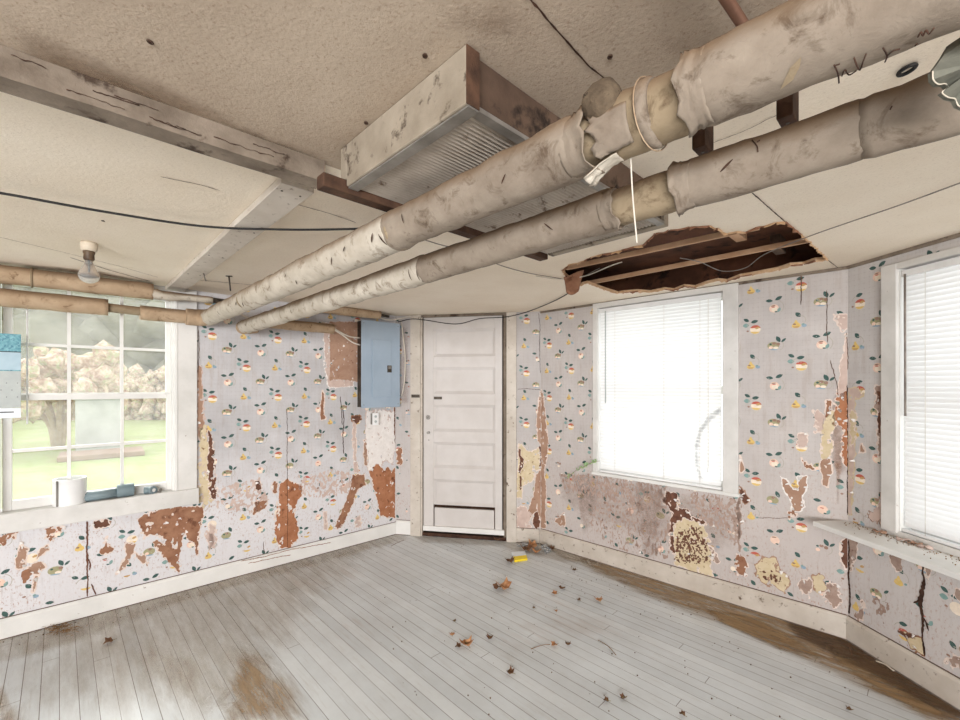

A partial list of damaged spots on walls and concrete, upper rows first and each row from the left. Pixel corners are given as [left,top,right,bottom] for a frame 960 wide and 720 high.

crack [530,0,604,78]
spalling [561,221,828,295]
peeling [518,395,547,490]
spalling [662,491,742,564]
crack [845,540,853,614]
crack [913,567,929,656]